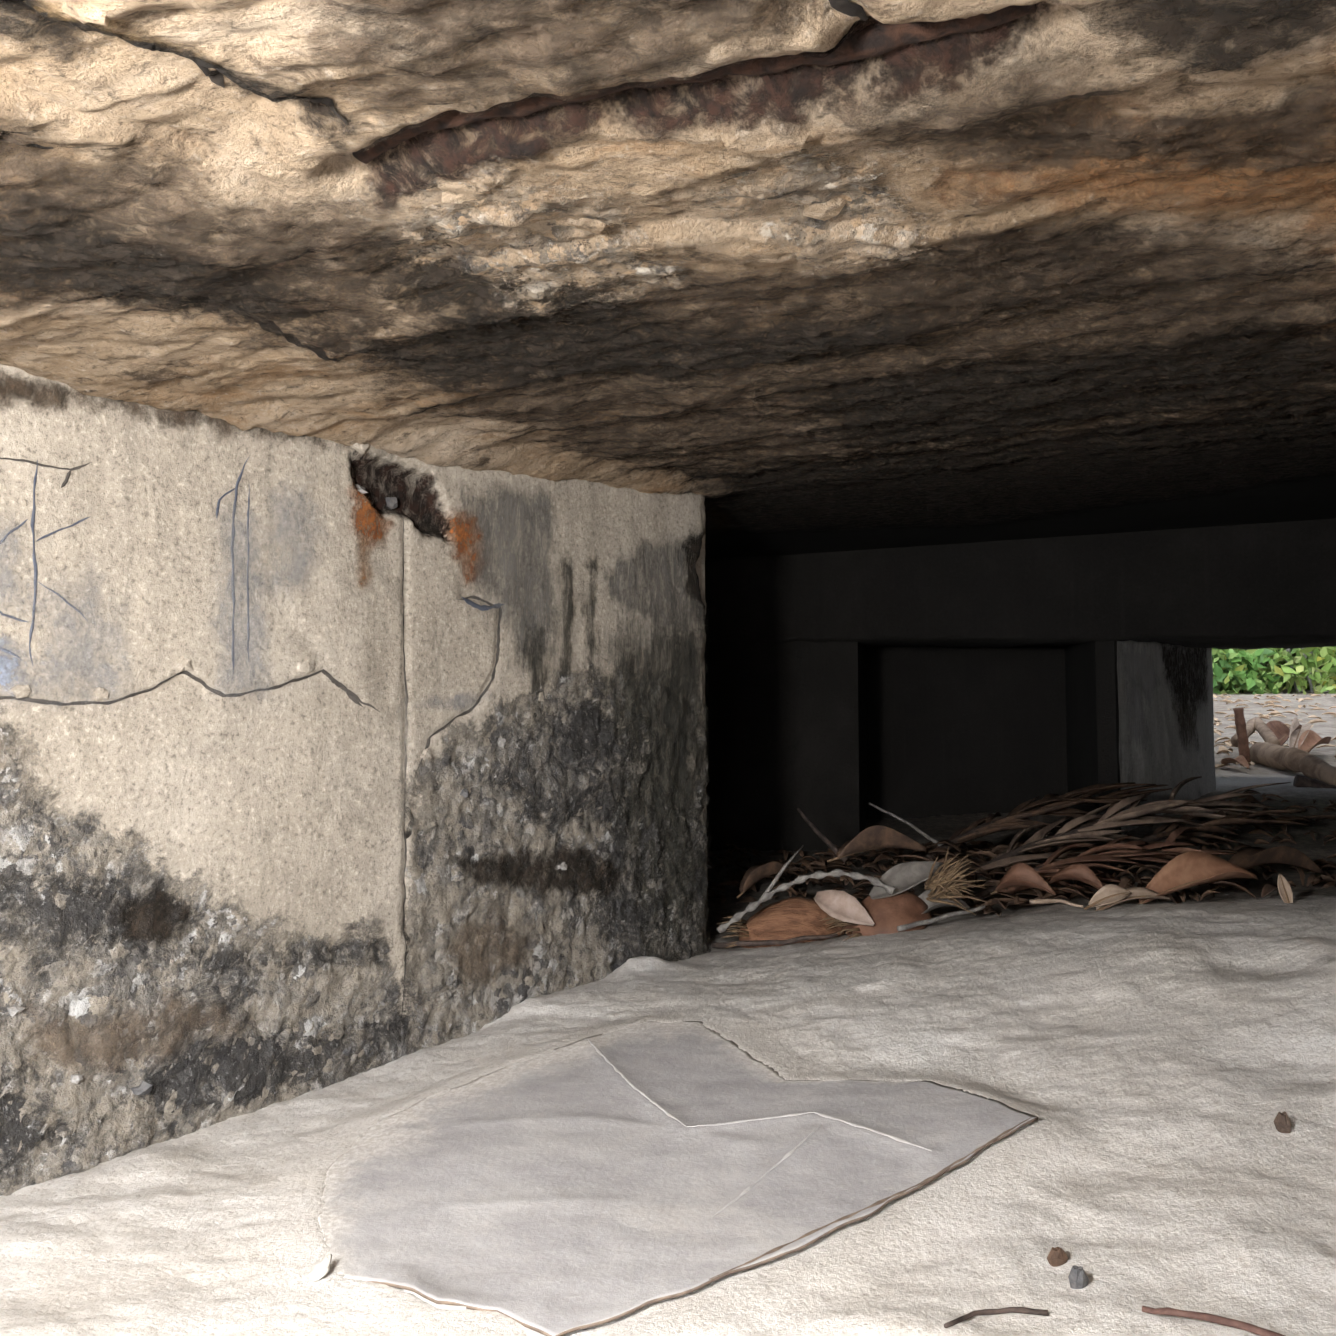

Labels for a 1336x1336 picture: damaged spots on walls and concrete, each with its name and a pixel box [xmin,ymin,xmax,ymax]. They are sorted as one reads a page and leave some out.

water stain [0,0,108,61]
crack [0,0,365,151]
water stain [306,0,786,149]
crack [829,0,871,21]
water stain [1089,0,1336,71]
crack [189,297,340,362]
rust [351,489,393,586]
spalling [348,443,451,539]
rust [447,512,482,582]
water stain [0,85,1336,961]